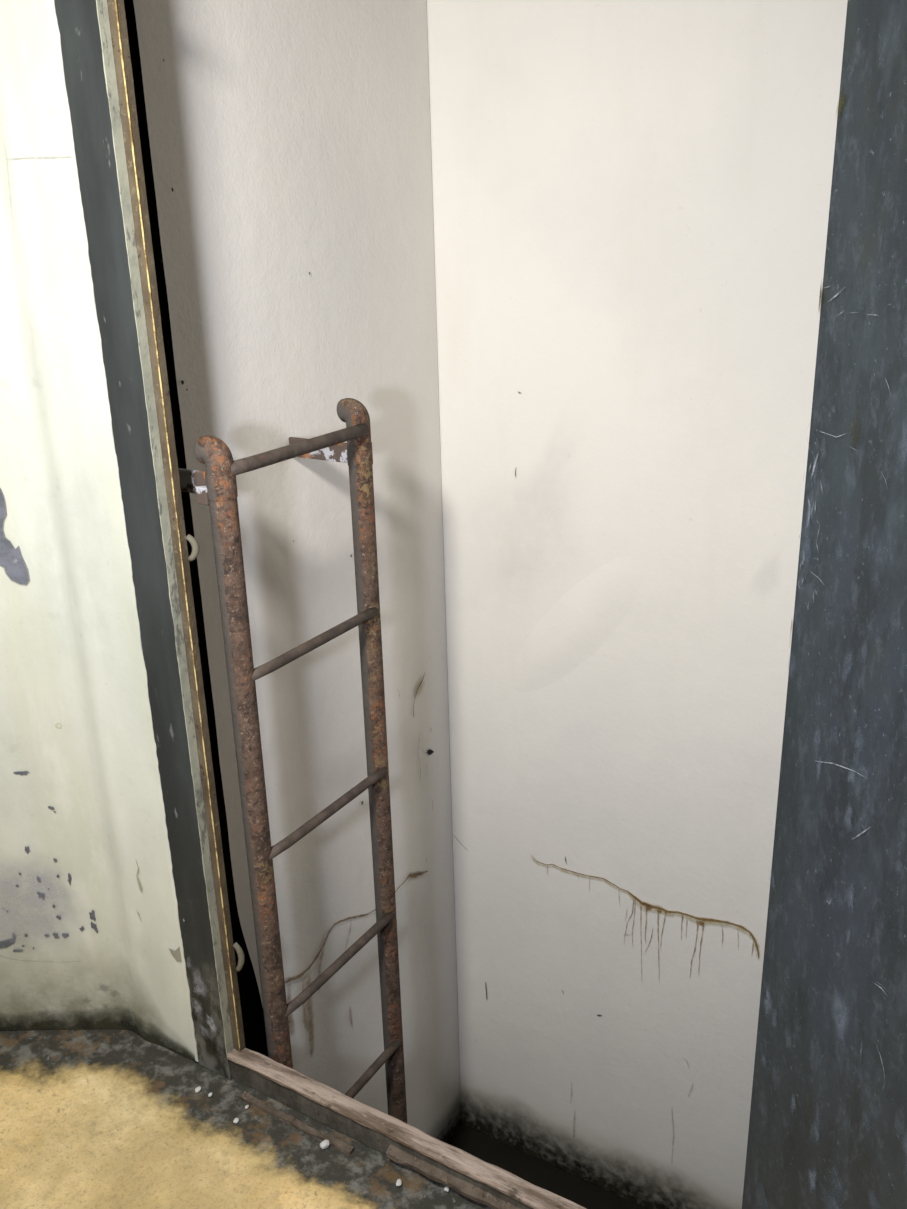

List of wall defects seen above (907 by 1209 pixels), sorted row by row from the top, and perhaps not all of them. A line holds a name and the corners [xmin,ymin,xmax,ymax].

peeling [0,488,30,585]
peeling [0,858,98,952]
crack [285,871,427,1054]
crack [532,856,759,977]
leakage [0,1000,200,1065]
leakage [437,1102,693,1209]